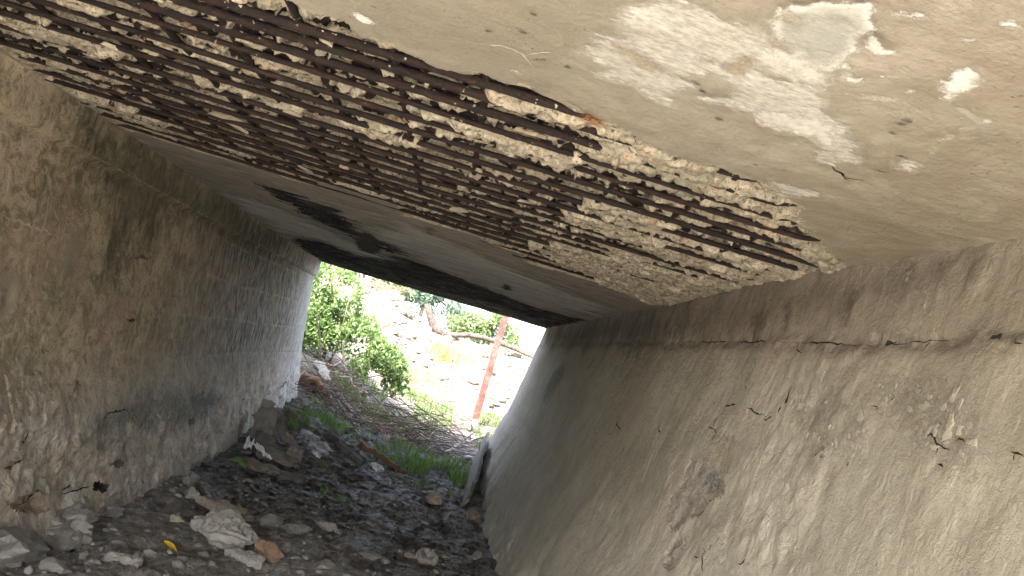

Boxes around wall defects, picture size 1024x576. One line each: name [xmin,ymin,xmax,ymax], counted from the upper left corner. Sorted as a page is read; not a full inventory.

damp [582,0,894,167]
damp [940,67,980,99]
spalling [0,0,851,328]
damp [77,112,666,349]
crack [677,333,1023,353]
crack [708,386,792,439]
crack [923,431,965,468]